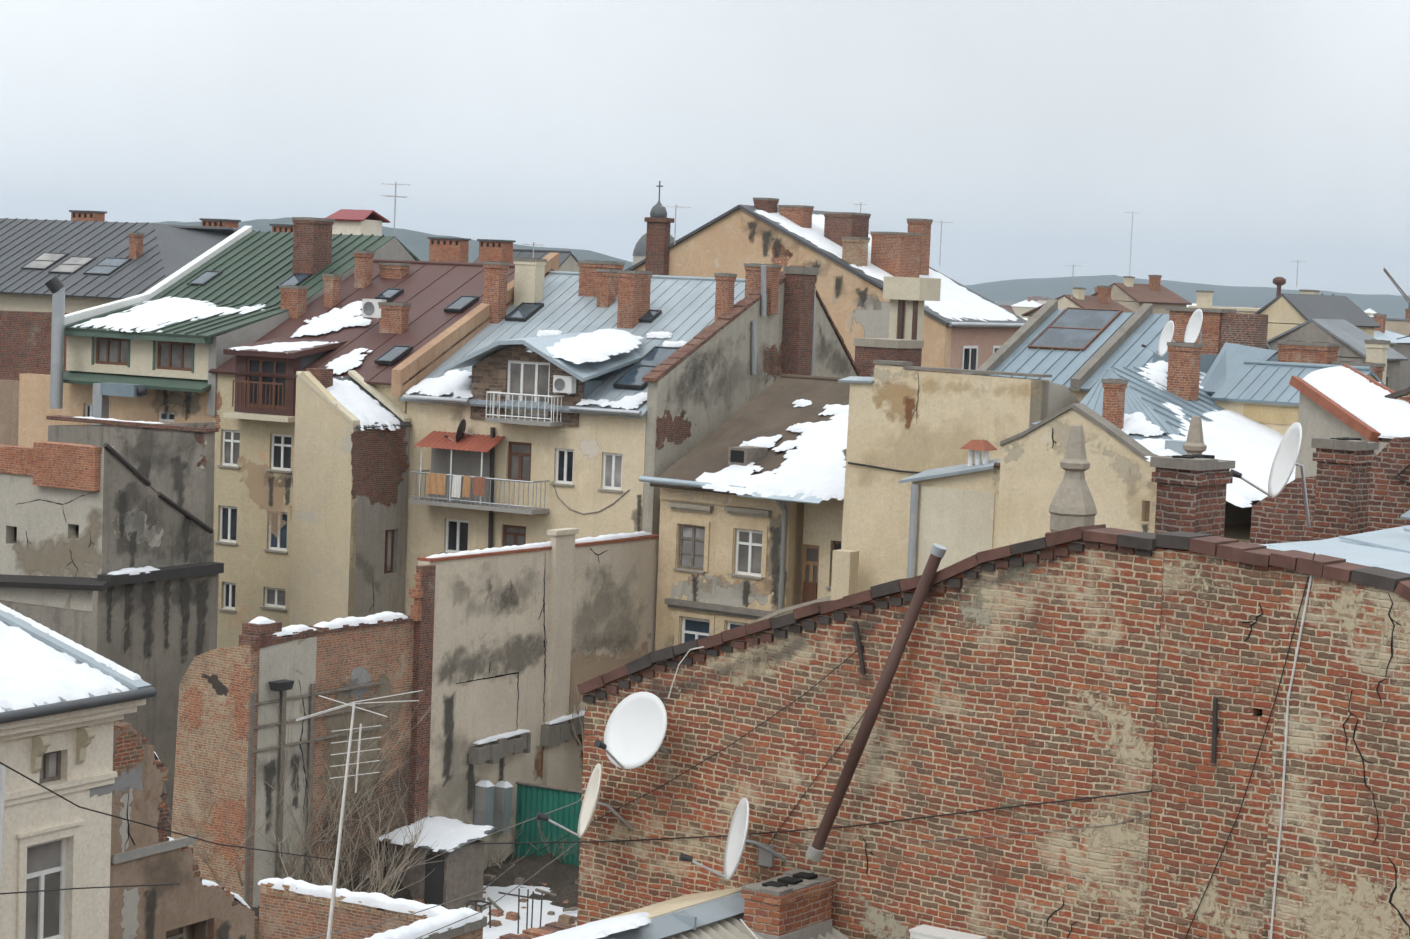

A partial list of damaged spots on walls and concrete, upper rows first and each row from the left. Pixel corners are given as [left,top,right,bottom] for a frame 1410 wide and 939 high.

water stain [154,390,200,420]
flaking render [351,421,410,507]
flaking render [655,410,696,450]
water stain [13,510,101,577]
water stain [105,433,208,662]
crack [1242,603,1264,642]
flaking render [180,653,253,749]
rust [534,748,544,778]
crack [1343,593,1410,936]
flaking render [113,720,253,911]